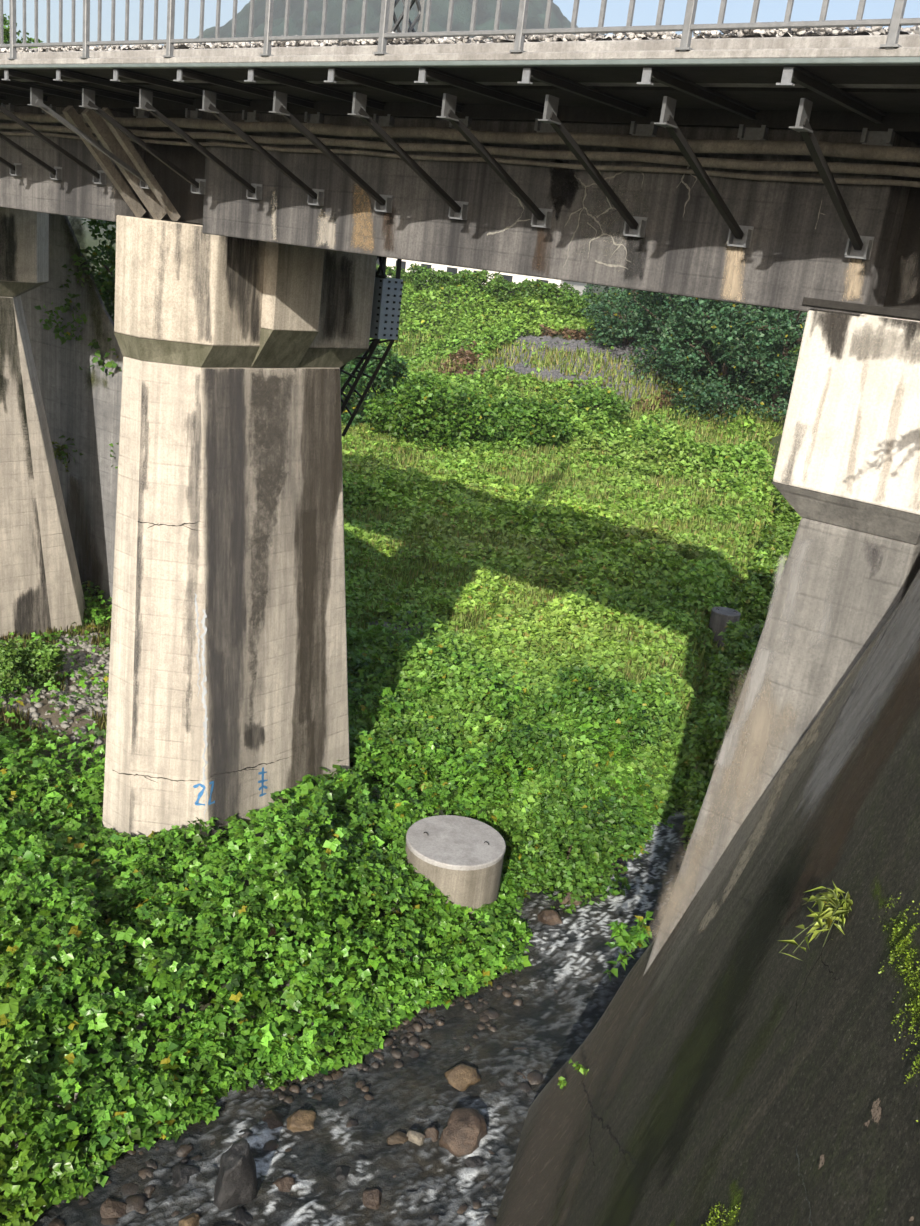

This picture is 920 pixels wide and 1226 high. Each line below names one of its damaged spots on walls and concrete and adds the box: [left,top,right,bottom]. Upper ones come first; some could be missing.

crack [487,193,531,235]
crack [563,170,644,268]
crack [677,166,697,215]
water stain [226,237,259,341]
water stain [814,258,920,358]
water stain [1,375,28,425]
crack [138,521,204,531]
water stain [188,368,245,845]
water stain [289,368,342,789]
crack [112,755,293,783]
water stain [503,920,681,1226]
spalling [864,1098,881,1127]